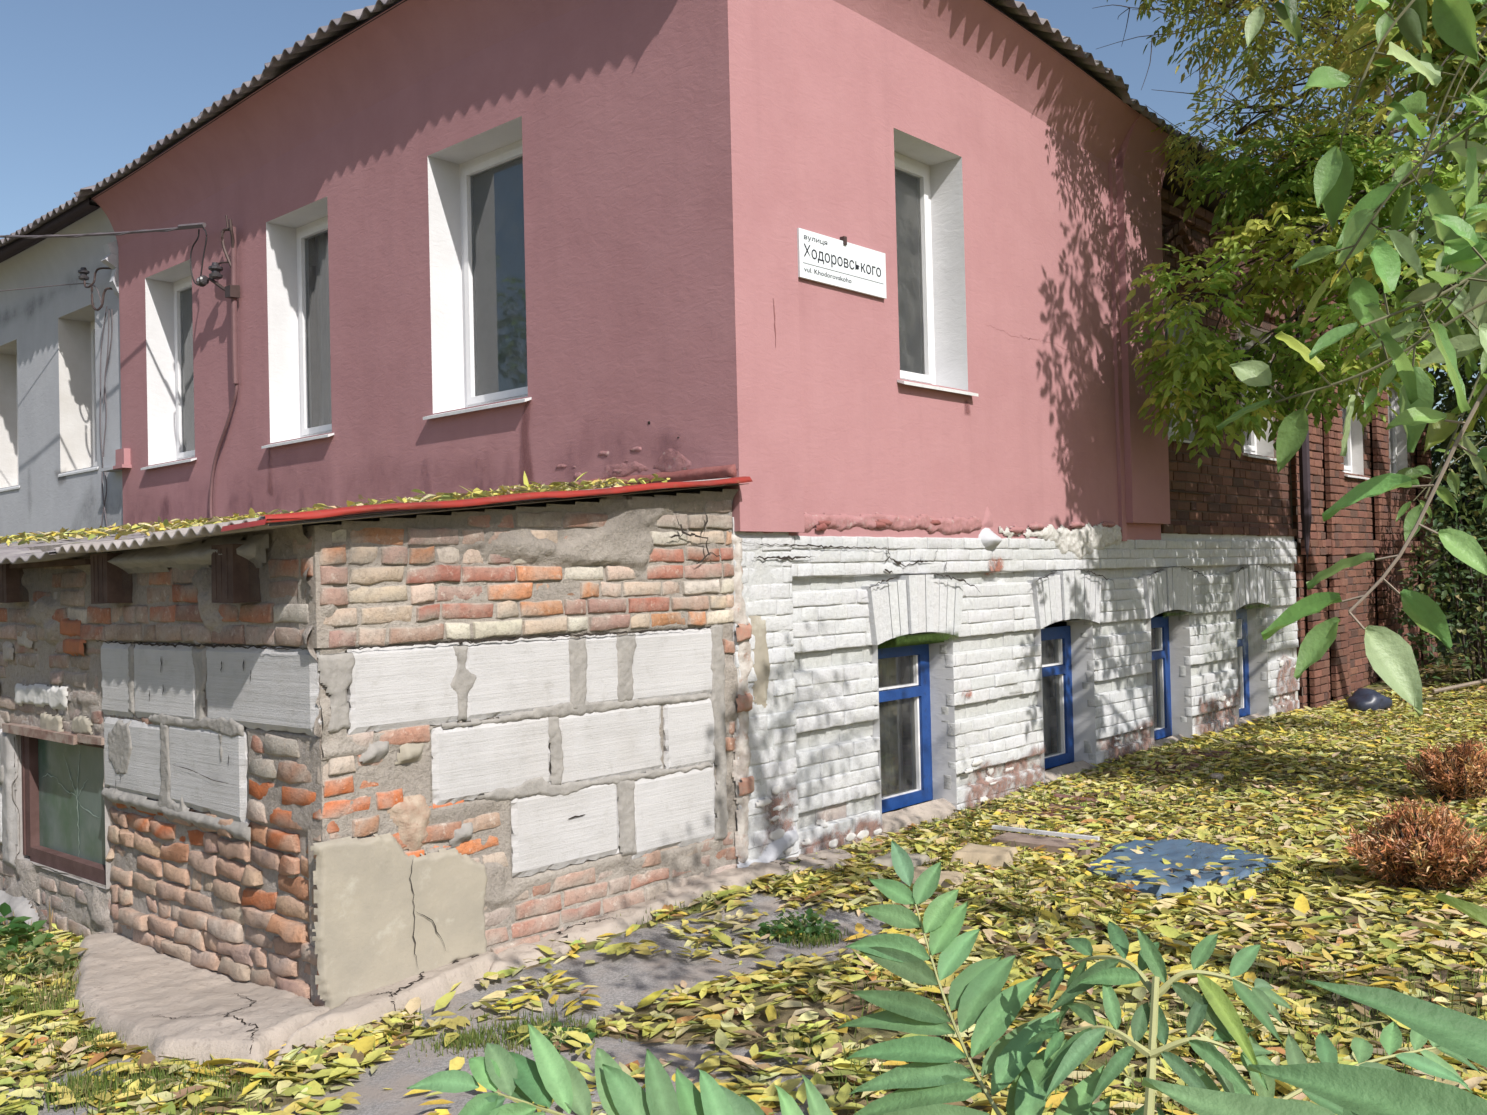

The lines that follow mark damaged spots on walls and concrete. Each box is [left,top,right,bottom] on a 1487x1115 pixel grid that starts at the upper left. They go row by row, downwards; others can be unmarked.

damp [520,408,532,486]
crack [670,508,980,592]
crack [409,861,479,966]